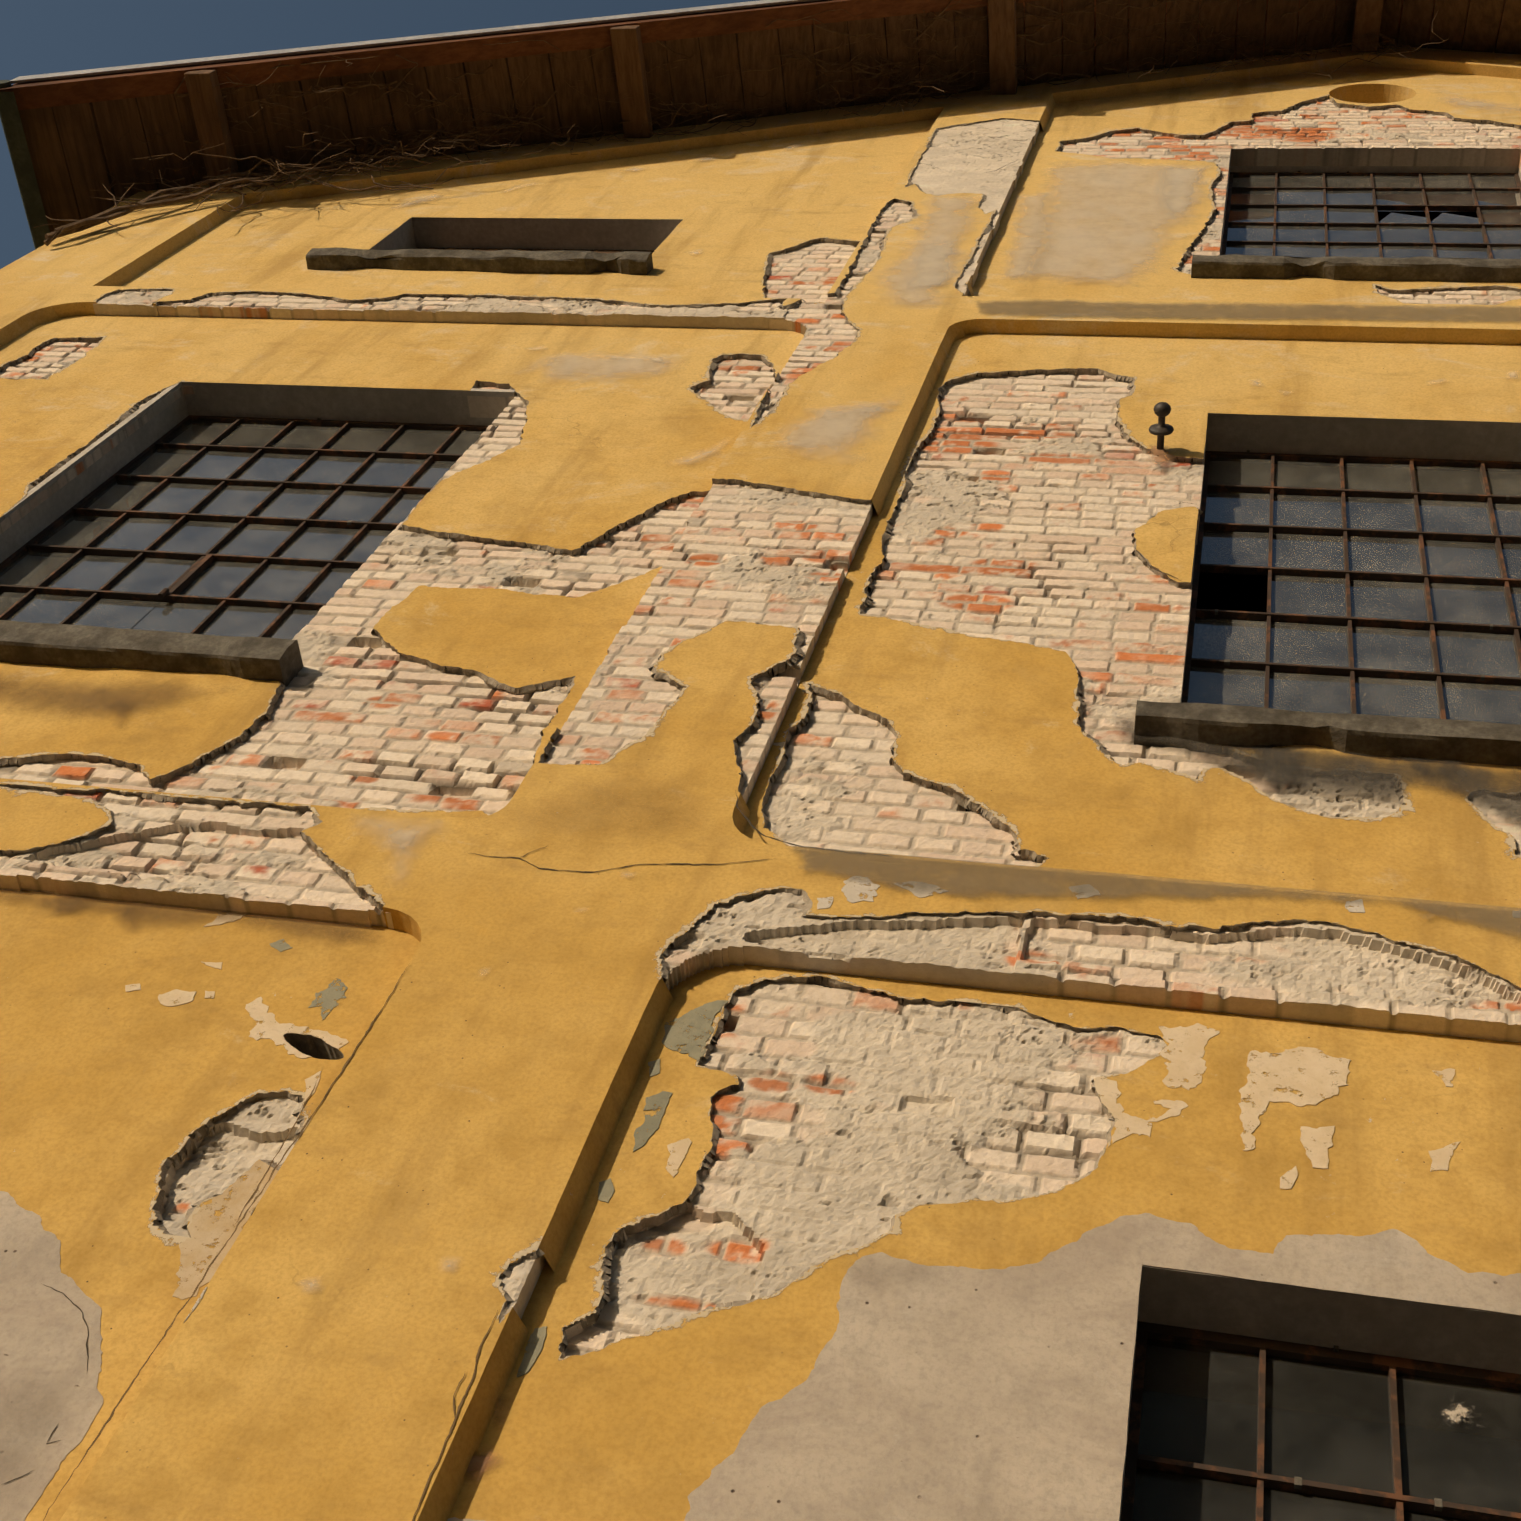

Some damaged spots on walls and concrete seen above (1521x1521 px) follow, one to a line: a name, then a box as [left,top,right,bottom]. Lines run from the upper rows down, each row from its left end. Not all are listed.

spalling [0,336,106,380]
spalling [93,118,1040,428]
spalling [1055,94,1521,275]
spalling [1372,284,1521,305]
spalling [0,368,1415,929]
crack [473,790,818,872]
leakage [1155,735,1521,817]
peeling [125,983,141,992]
peeling [270,939,293,952]
spalling [148,978,349,1323]
peeling [491,876,1521,1521]
peeling [0,1191,103,1521]